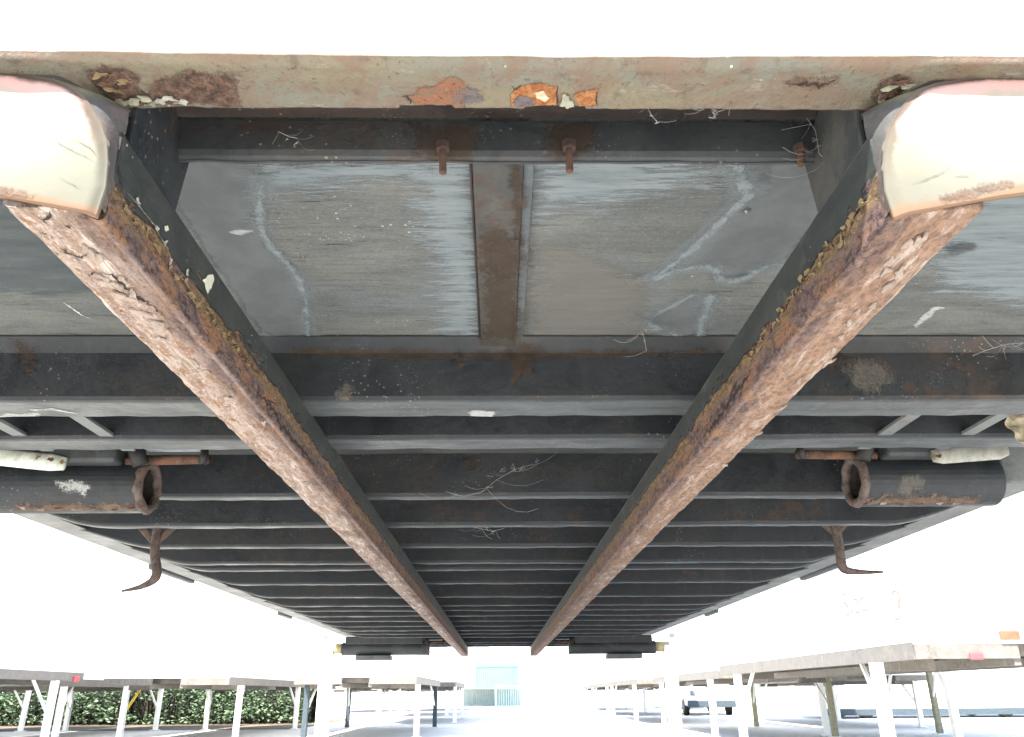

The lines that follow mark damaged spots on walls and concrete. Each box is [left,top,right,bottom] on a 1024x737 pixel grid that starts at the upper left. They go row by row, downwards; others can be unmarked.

peeling [111,92,193,107]
peeling [559,93,574,109]
rust [939,180,1013,204]
water stain [177,162,481,336]
water stain [528,163,818,336]
rust [294,164,528,369]
rust [13,501,146,511]
rust [863,493,982,506]